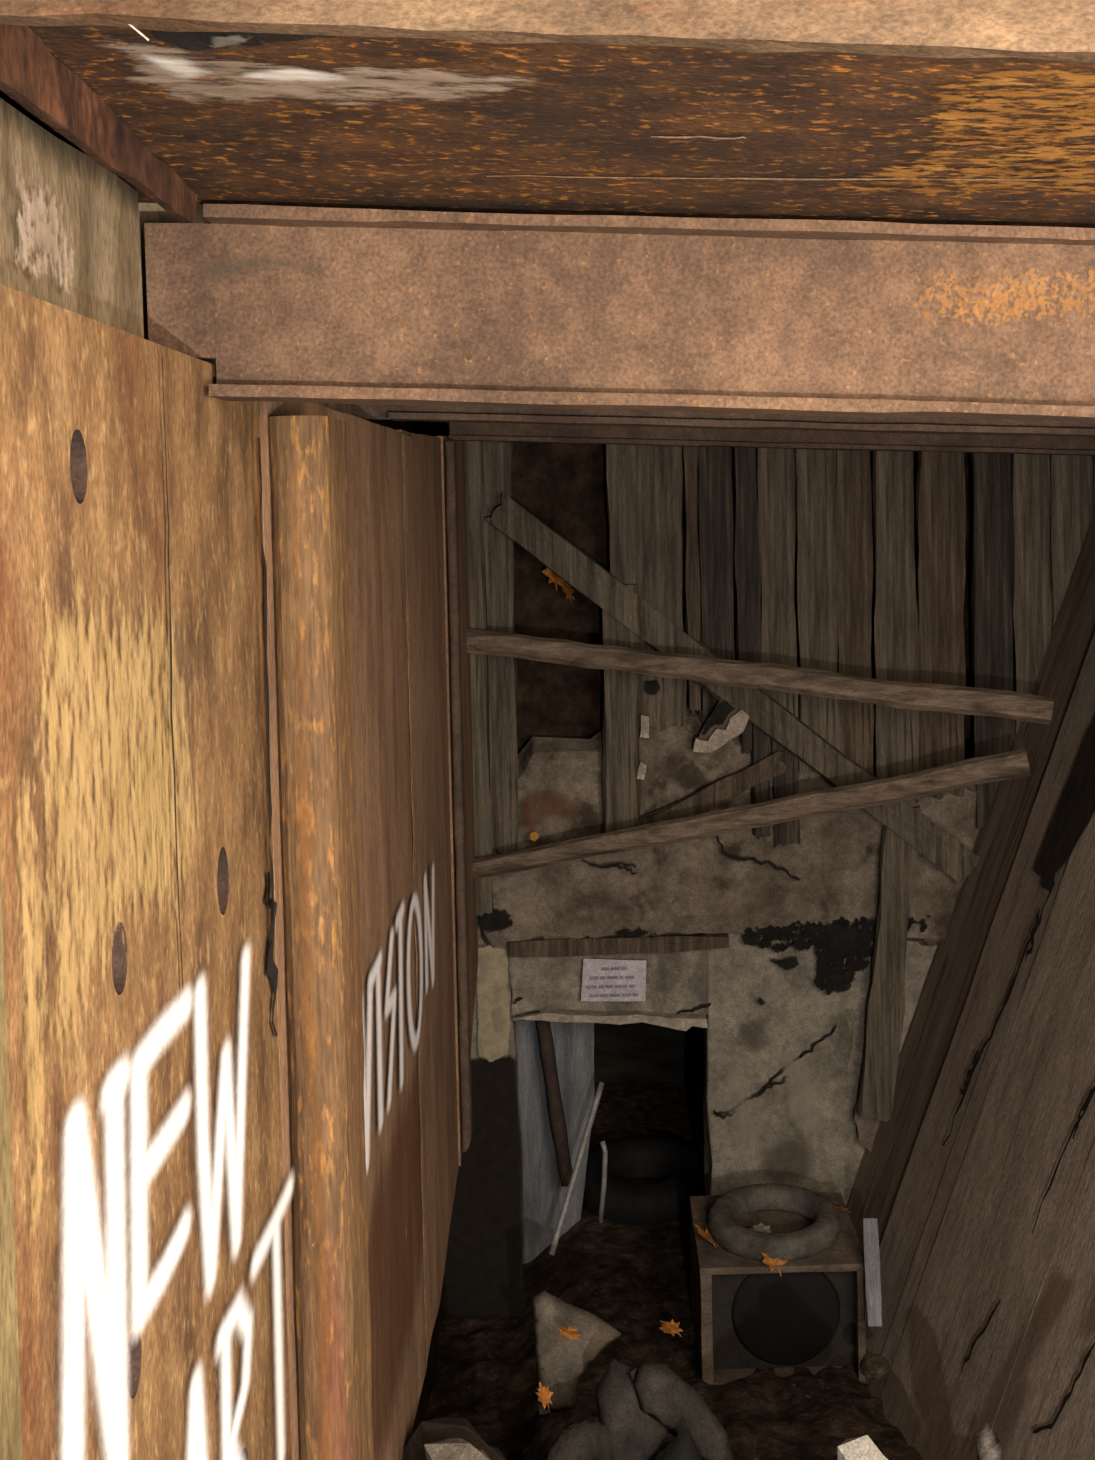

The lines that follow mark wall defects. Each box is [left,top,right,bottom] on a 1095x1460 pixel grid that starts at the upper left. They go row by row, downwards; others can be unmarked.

damp [112,44,523,105]
corrosion [827,69,1095,196]
crack [258,437,278,1037]
crack [716,836,800,881]
peeling [741,916,877,995]
peeling [908,914,930,933]
crack [714,1025,837,1119]